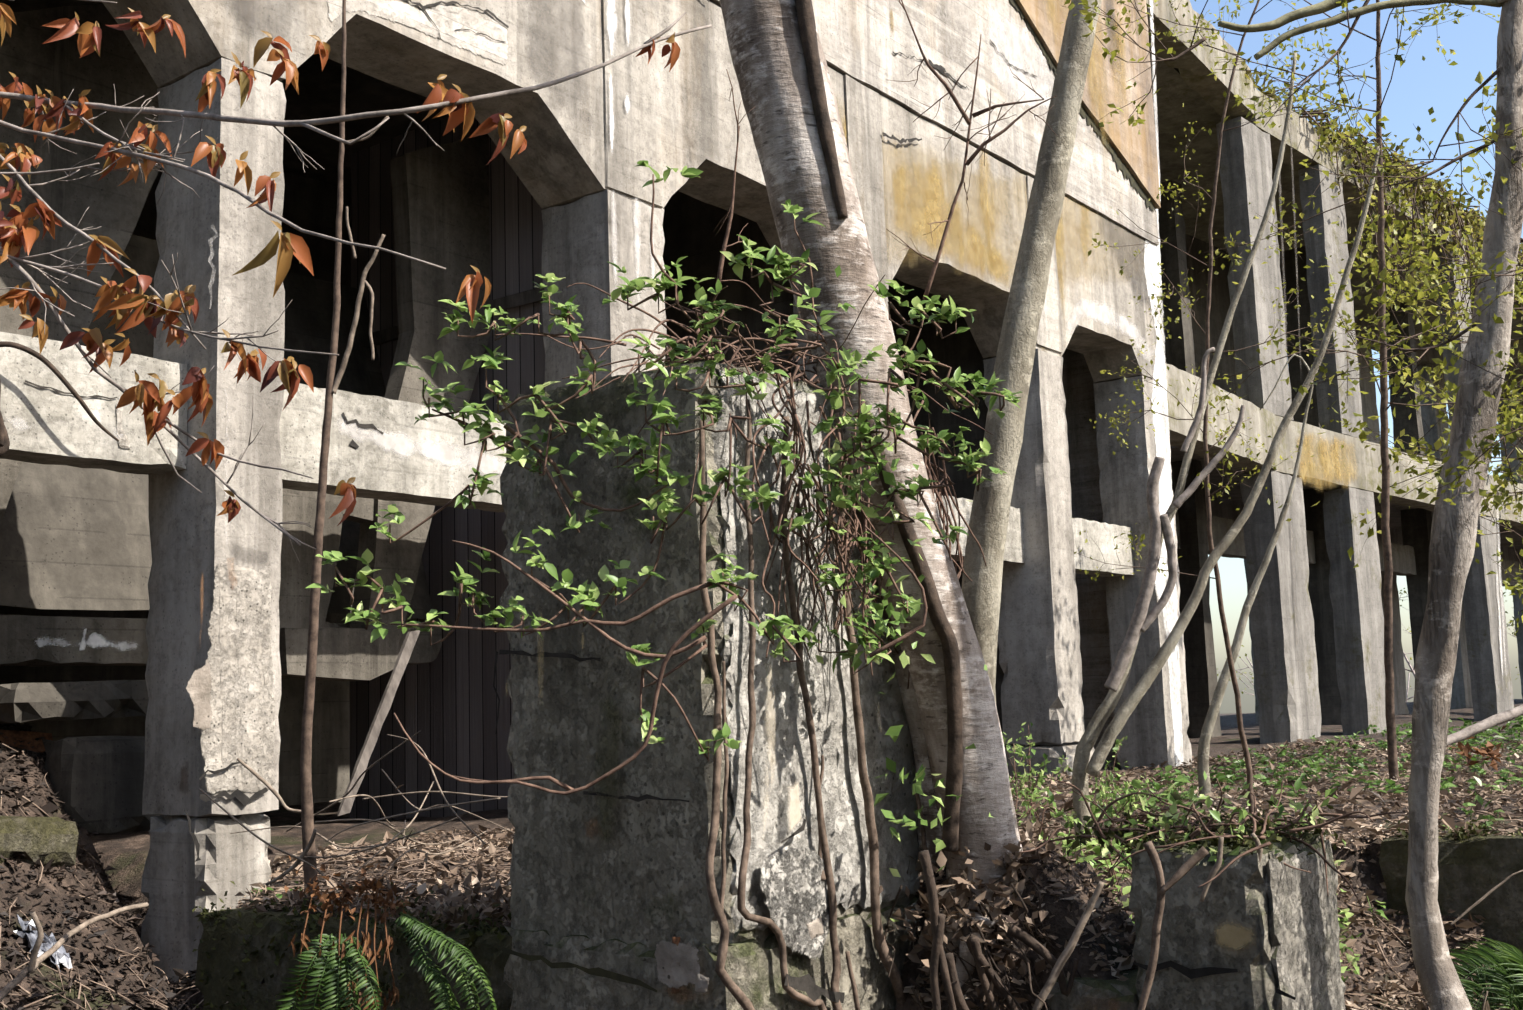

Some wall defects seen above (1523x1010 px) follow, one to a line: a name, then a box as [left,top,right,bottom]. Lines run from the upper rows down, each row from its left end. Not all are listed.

spalling [326,0,508,65]
crack [408,0,509,42]
water stain [895,168,947,246]
water stain [1300,436,1354,485]
spalling [186,561,276,794]
spalling [760,785,830,959]
crack [489,944,657,992]
crack [1133,960,1238,979]
crack [1276,988,1296,1000]